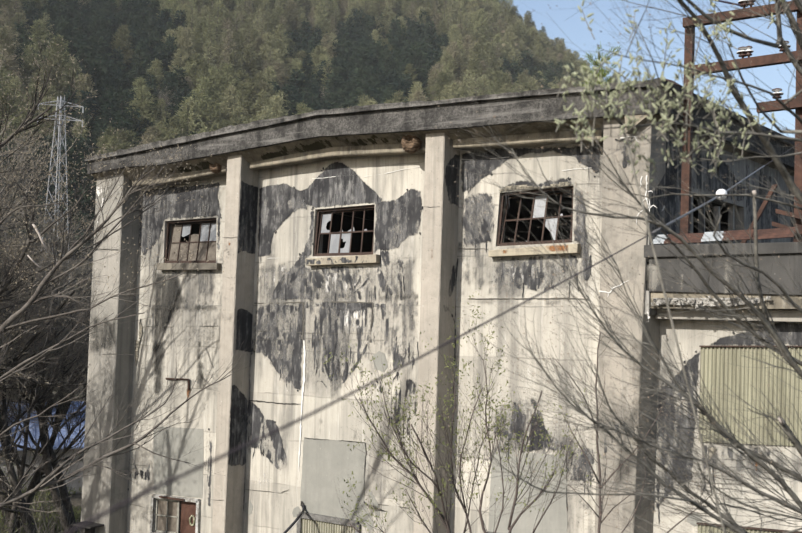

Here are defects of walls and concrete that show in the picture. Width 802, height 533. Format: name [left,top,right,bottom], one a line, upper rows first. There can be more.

water stain [147,210,217,392]
water stain [466,199,484,288]
water stain [498,257,534,294]
spalling [651,296,771,308]
water stain [259,260,418,471]